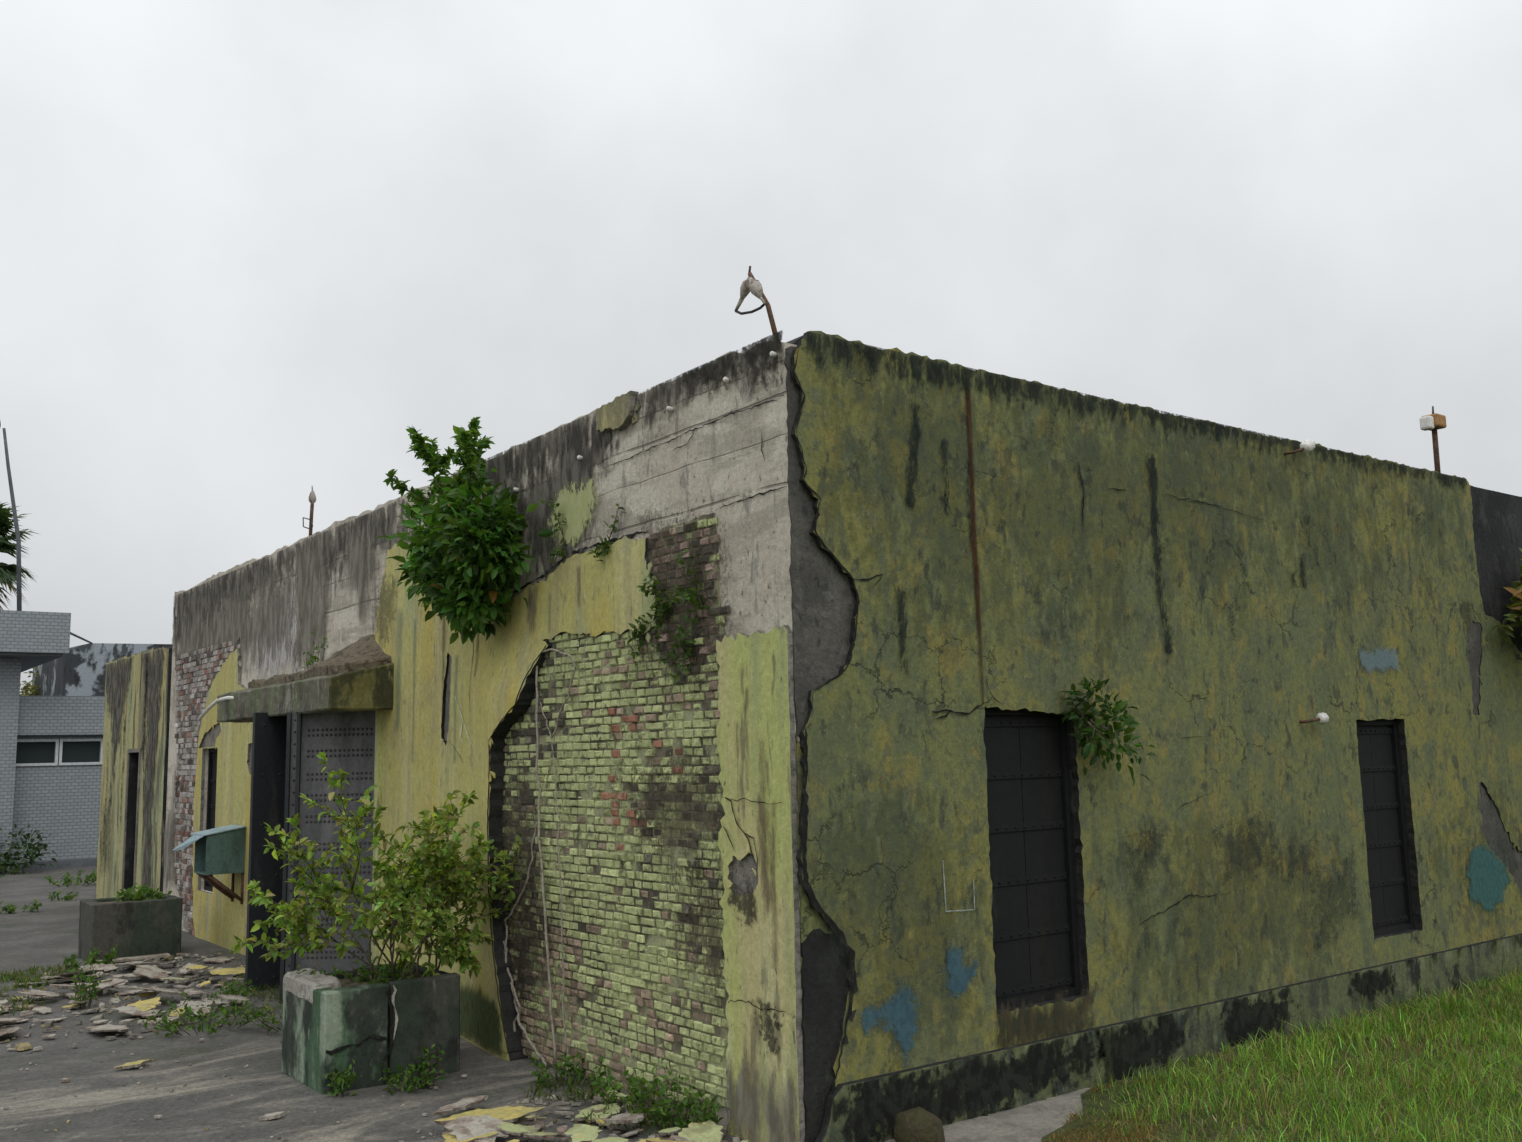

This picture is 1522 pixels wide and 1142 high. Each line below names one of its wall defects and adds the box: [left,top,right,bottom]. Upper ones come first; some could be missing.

spalling [173,572,300,936]
leakage [103,499,417,895]
spalling [489,513,758,1142]
spalling [784,339,863,850]
crack [932,677,1002,719]
spalling [1467,485,1522,715]
spalling [1477,782,1522,894]
peeling [0,953,275,1054]
spalling [799,885,859,1142]
leakage [833,988,1185,1142]
leakage [1221,988,1304,1046]
leakage [1348,965,1398,1004]